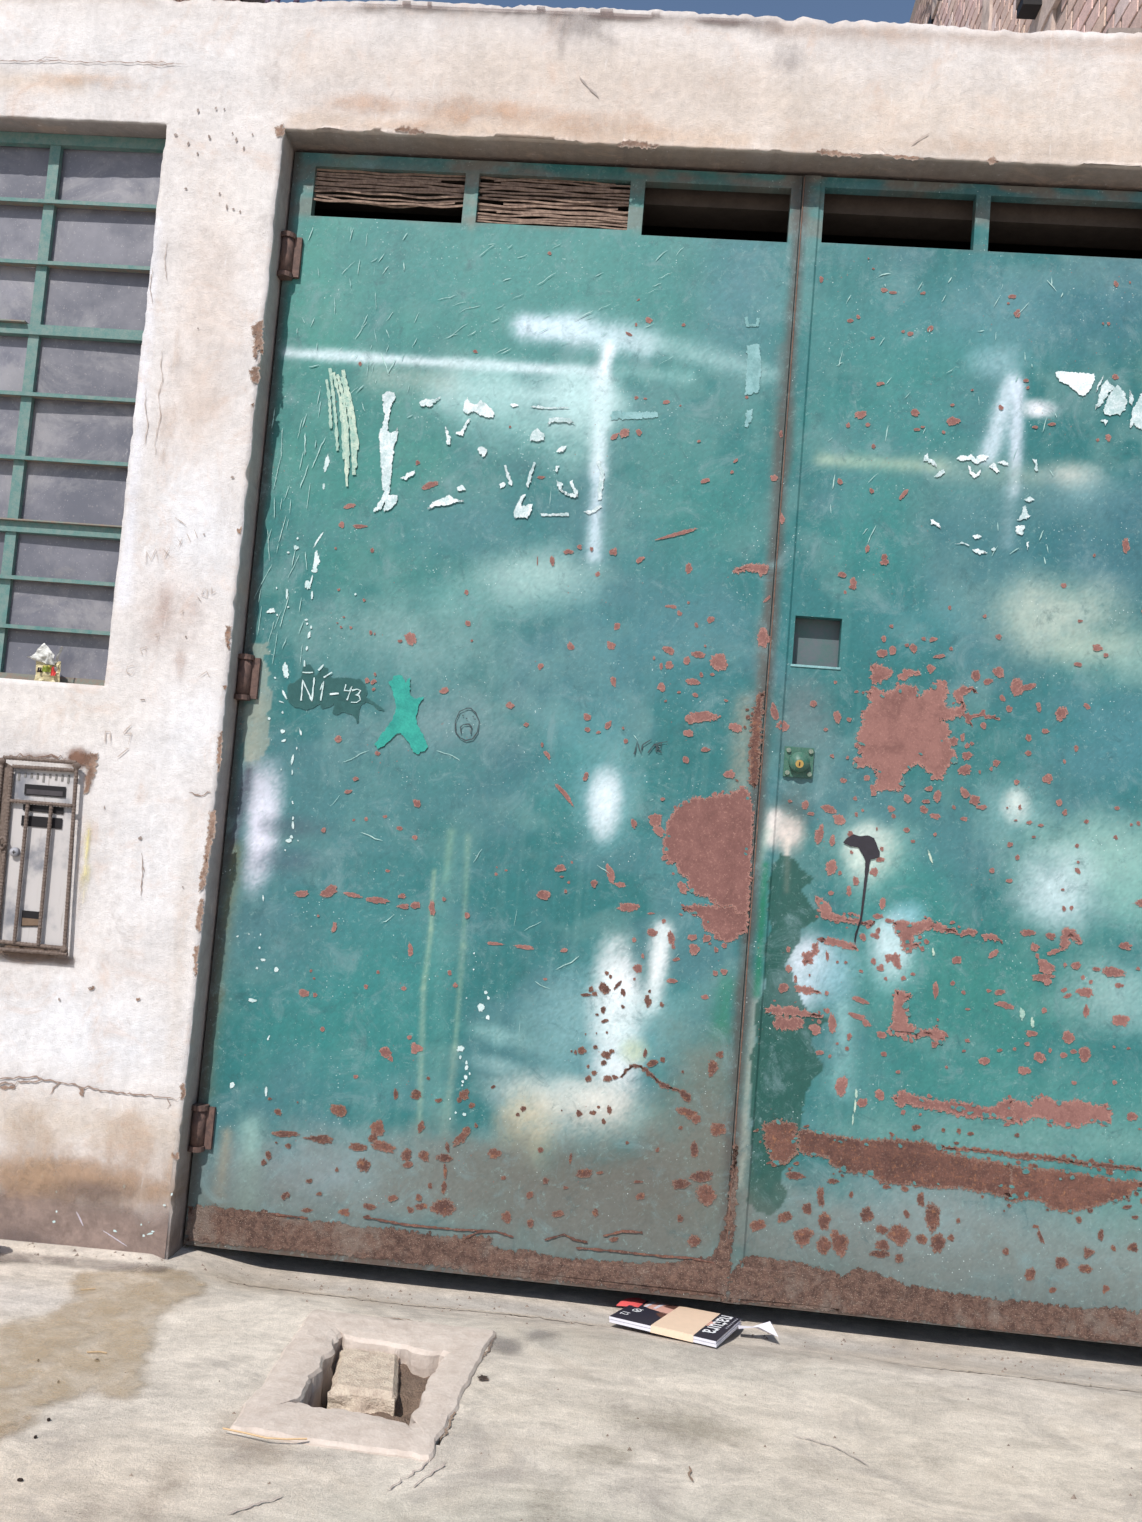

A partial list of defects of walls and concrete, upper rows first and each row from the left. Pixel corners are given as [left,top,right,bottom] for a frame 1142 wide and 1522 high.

peeling [942,404,961,434]
peeling [339,503,367,528]
peeling [398,632,417,645]
rust [824,636,1068,821]
rust [68,749,90,785]
rust [648,691,766,976]
crack [0,1076,183,1107]
rust [184,868,1142,1345]
damp [0,1161,203,1419]